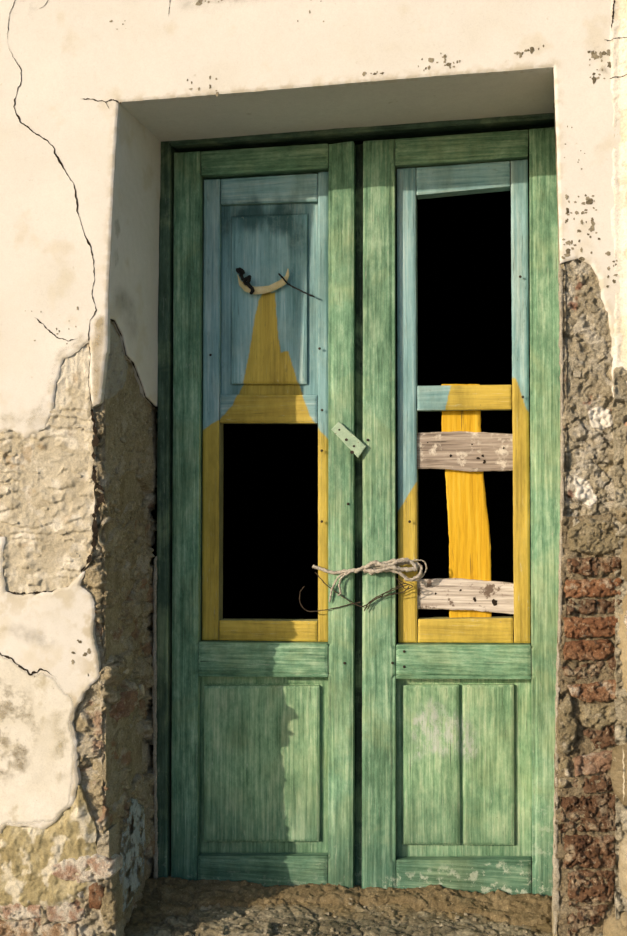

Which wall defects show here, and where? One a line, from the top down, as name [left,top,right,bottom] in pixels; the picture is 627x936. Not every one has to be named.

crack [7,1,158,573]
flaking render [559,0,627,526]
crack [0,653,51,676]
flaking render [0,320,158,936]